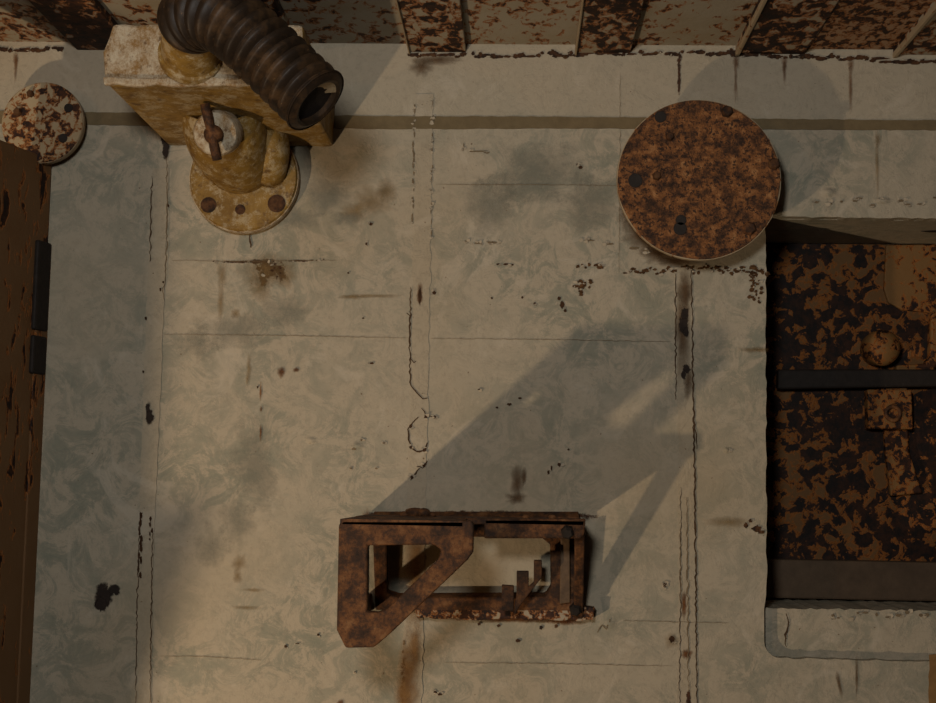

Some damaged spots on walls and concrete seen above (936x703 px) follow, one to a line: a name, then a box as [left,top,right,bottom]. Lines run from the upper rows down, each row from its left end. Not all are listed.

corrosion [224,259,286,286]
crack [166,287,433,480]
crack [437,270,722,703]